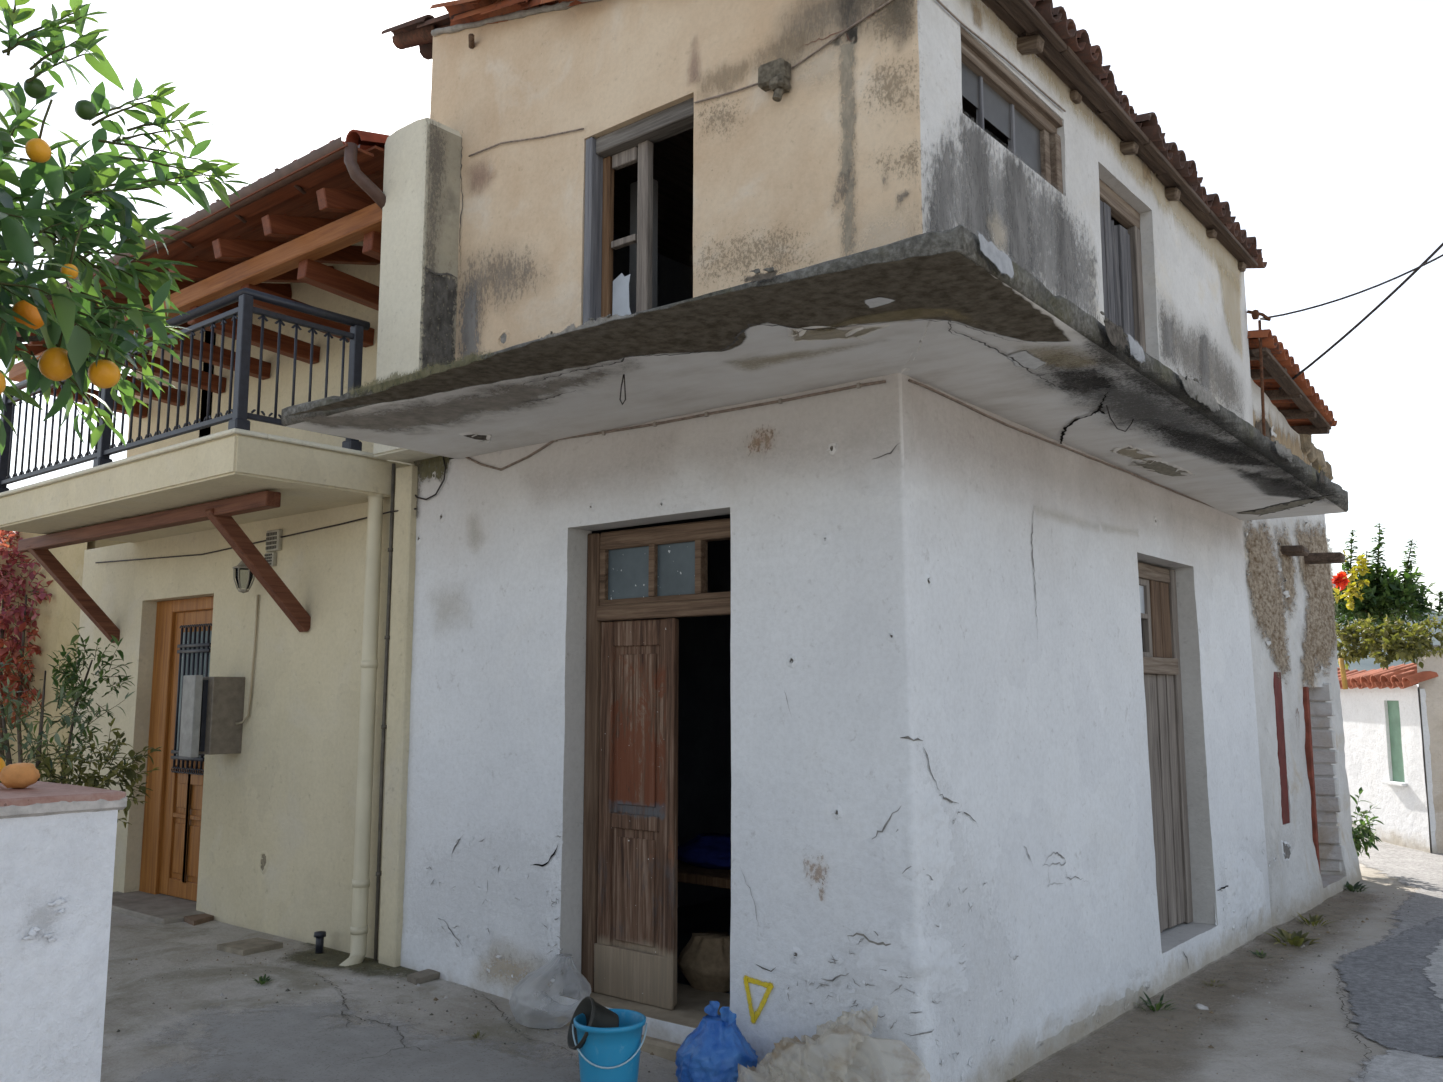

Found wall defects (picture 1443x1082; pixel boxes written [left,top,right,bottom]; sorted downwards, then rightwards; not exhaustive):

leakage [290,38,1341,504]
crack [477,319,1108,444]
peeling [787,325,889,342]
crack [900,736,978,826]
crack [312,971,438,1072]